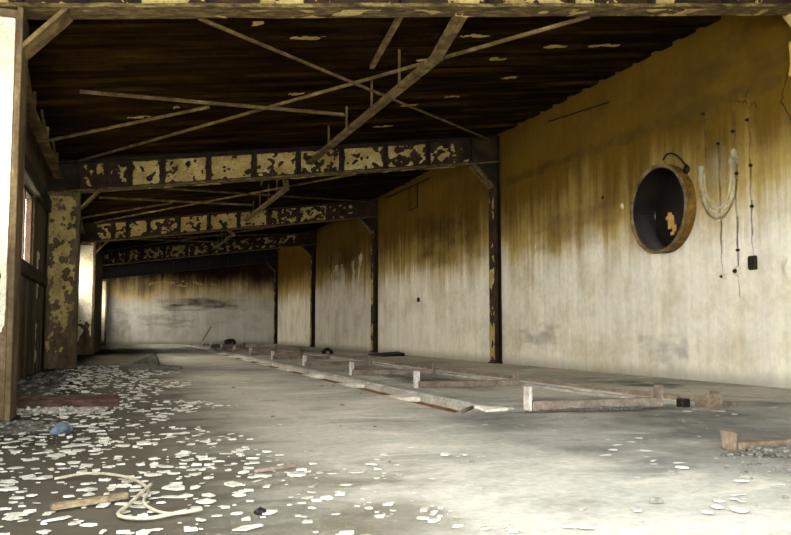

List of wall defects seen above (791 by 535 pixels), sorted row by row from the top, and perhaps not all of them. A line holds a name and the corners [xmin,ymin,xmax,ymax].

peeling [248,0,381,26]
peeling [503,0,564,14]
peeling [569,0,594,16]
peeling [647,0,706,16]
peeling [0,17,15,332]
peeling [84,144,469,189]
peeling [98,204,353,239]
peeling [105,235,295,263]
peeling [35,196,106,352]